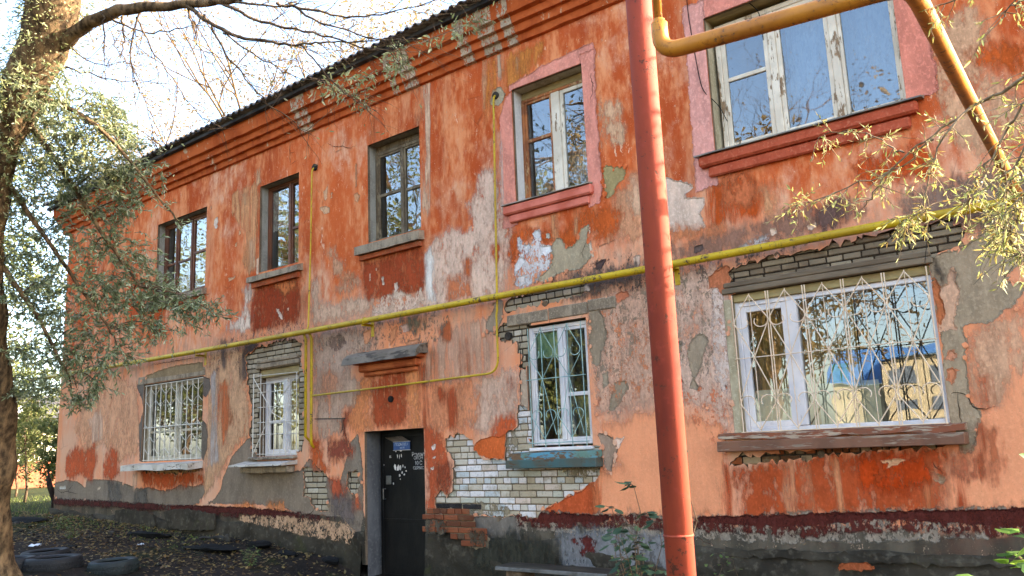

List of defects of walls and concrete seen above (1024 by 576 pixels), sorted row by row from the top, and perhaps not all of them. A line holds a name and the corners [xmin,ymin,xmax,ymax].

flaking render [247,339,331,511]
flaking render [348,470,363,499]
flaking render [422,229,654,550]
peeling [674,219,965,437]